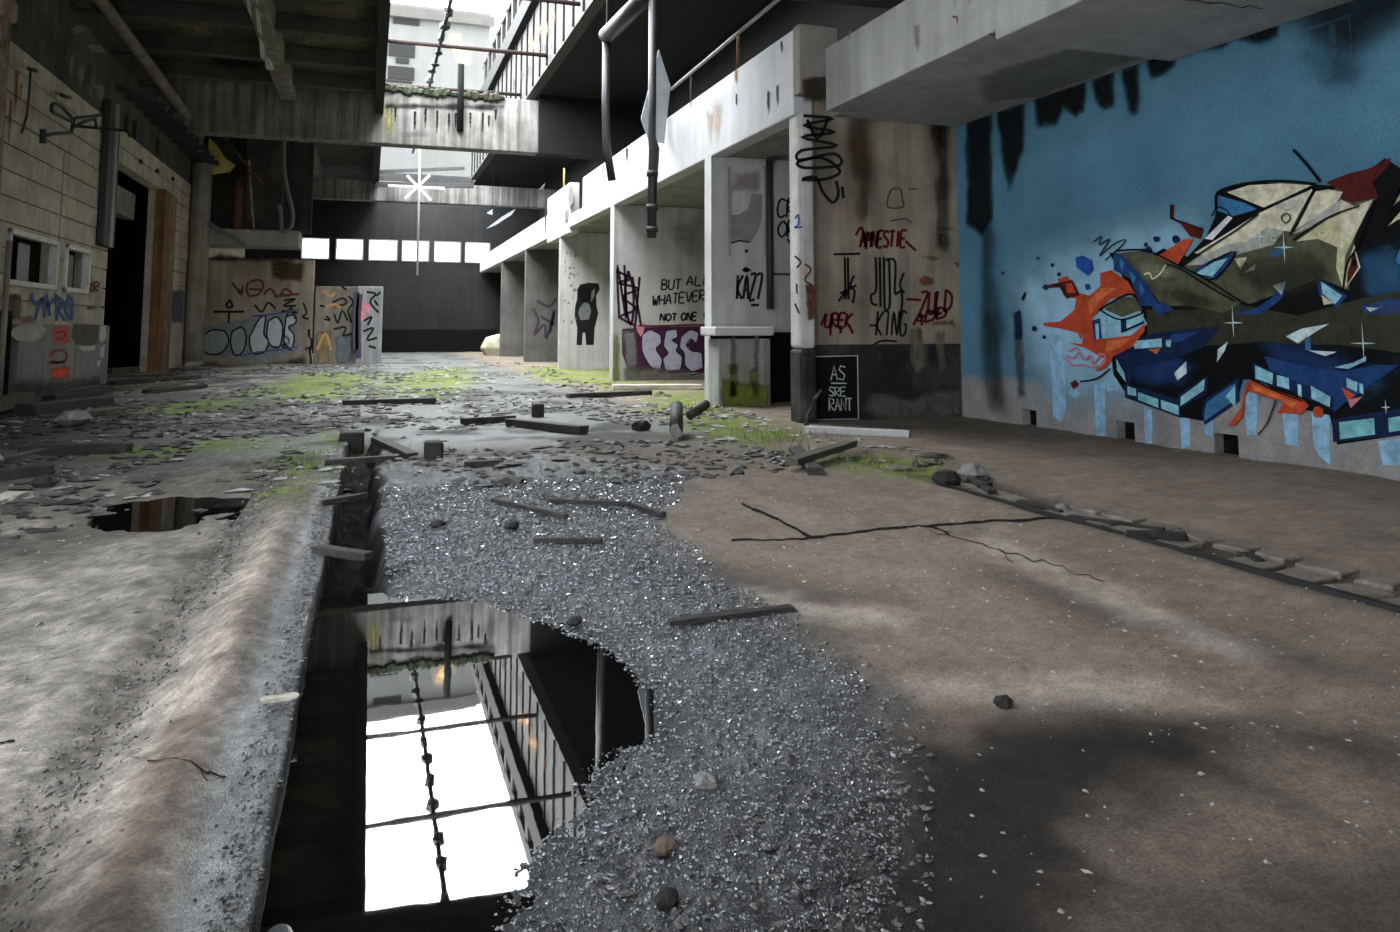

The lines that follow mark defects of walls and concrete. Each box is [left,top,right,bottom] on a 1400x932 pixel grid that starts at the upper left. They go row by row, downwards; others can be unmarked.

crack [731,503,1104,582]